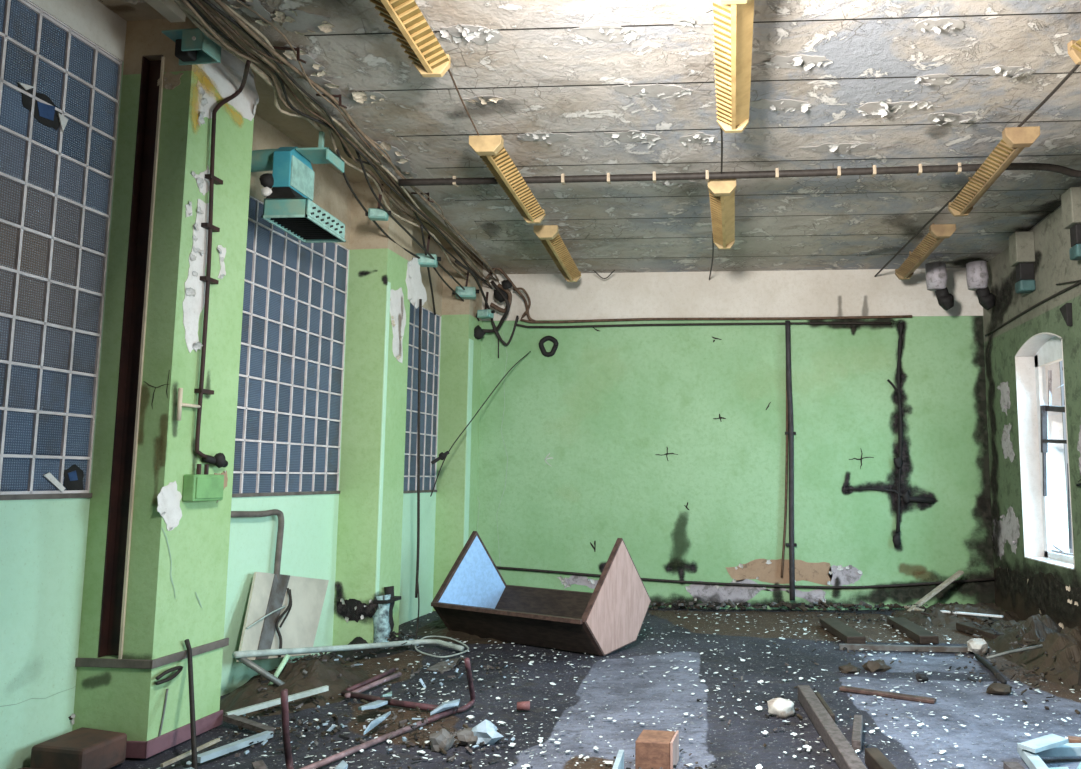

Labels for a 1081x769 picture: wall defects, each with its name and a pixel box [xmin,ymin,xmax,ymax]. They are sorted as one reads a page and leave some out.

peeling [227,0,386,104]
peeling [439,24,503,45]
peeling [758,54,833,71]
peeling [915,18,964,34]
peeling [194,47,259,127]
peeling [462,95,506,105]
peeling [855,100,972,126]
peeling [604,130,663,149]
peeling [182,165,226,353]
water stain [650,268,1081,621]
peeling [997,382,1015,462]
flaking render [685,559,863,606]